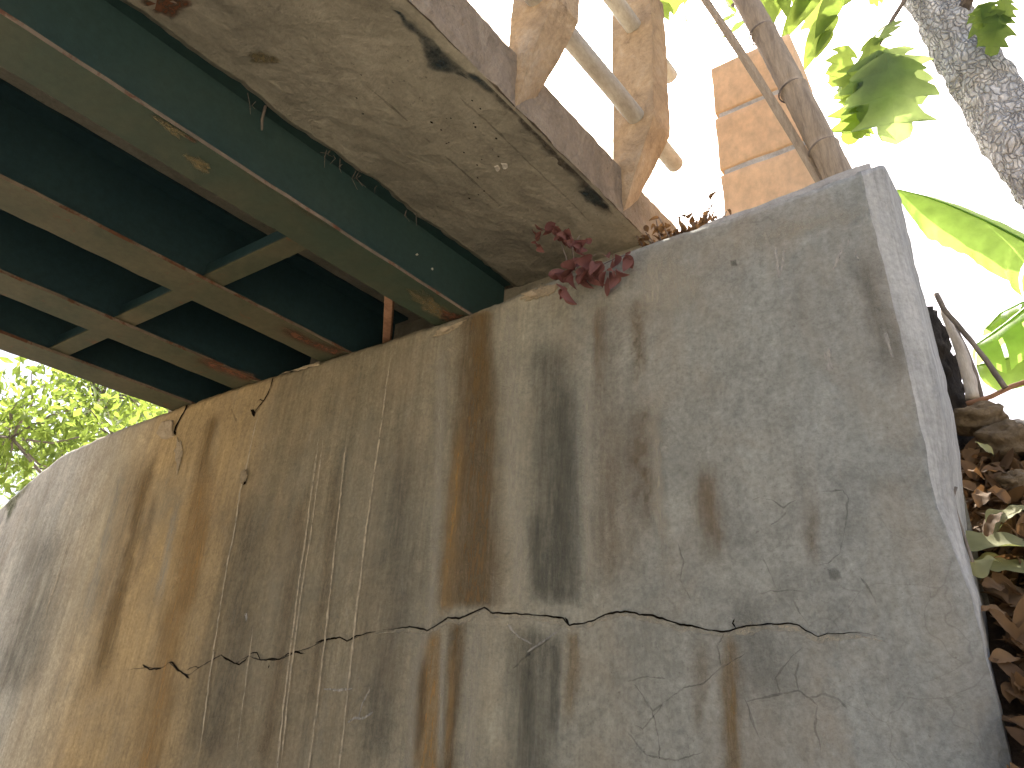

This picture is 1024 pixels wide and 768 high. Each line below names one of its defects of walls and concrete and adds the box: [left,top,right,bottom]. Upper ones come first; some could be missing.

damp [394,10,488,89]
crack [251,378,273,416]
crack [156,405,188,475]
rust [444,314,494,605]
crack [130,607,882,678]
rust [415,625,462,768]